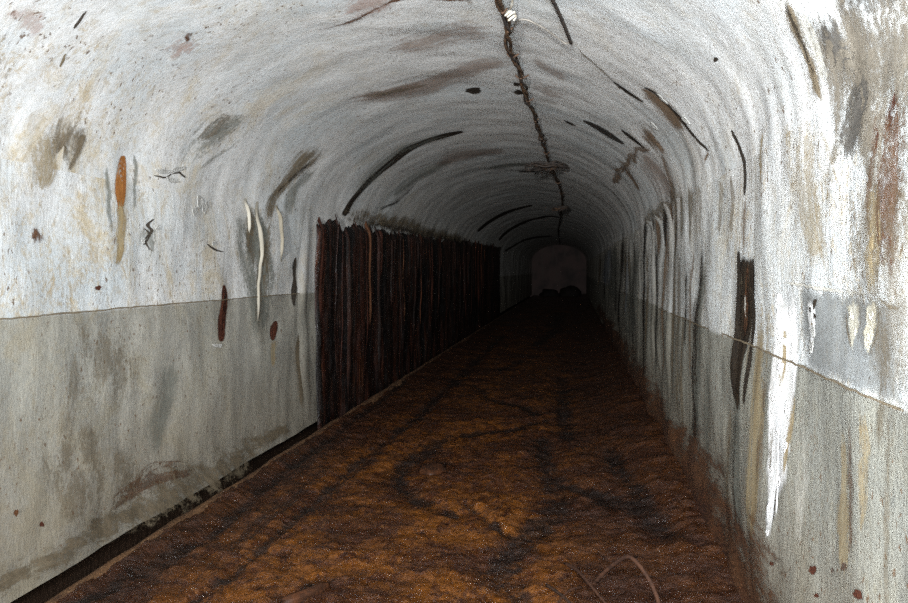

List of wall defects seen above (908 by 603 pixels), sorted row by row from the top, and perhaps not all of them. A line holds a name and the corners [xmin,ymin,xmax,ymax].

rust [105,156,137,264]
rust [315,214,501,430]
damp [598,155,706,449]
rust [597,305,778,603]
damp [726,251,766,534]
peeling [765,282,898,536]
damp [784,0,908,286]